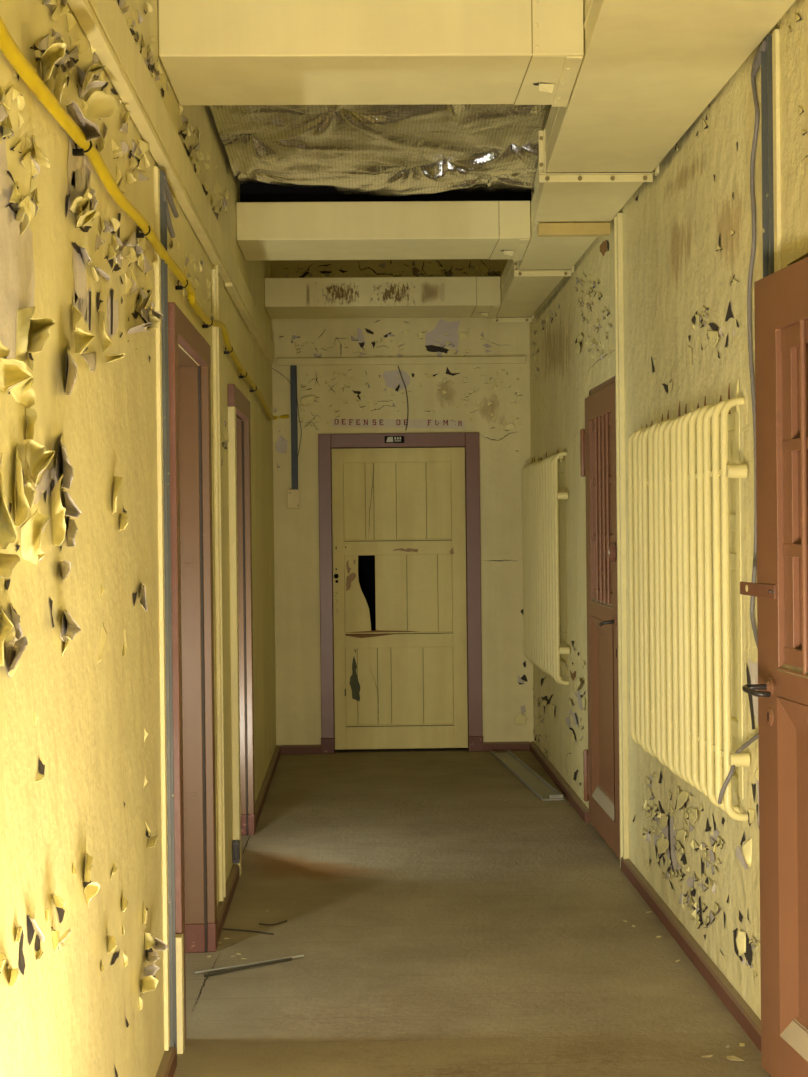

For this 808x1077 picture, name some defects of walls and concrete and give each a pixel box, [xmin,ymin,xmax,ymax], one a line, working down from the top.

peeling [30,0,214,396]
peeling [0,74,82,590]
peeling [279,319,522,429]
peeling [0,603,28,678]
peeling [50,598,81,657]
peeling [514,641,586,757]
peeling [746,658,758,730]
peeling [35,758,45,783]
peeling [632,769,760,978]
peeling [0,893,72,987]
peeling [101,925,128,972]
peeling [139,905,168,1011]